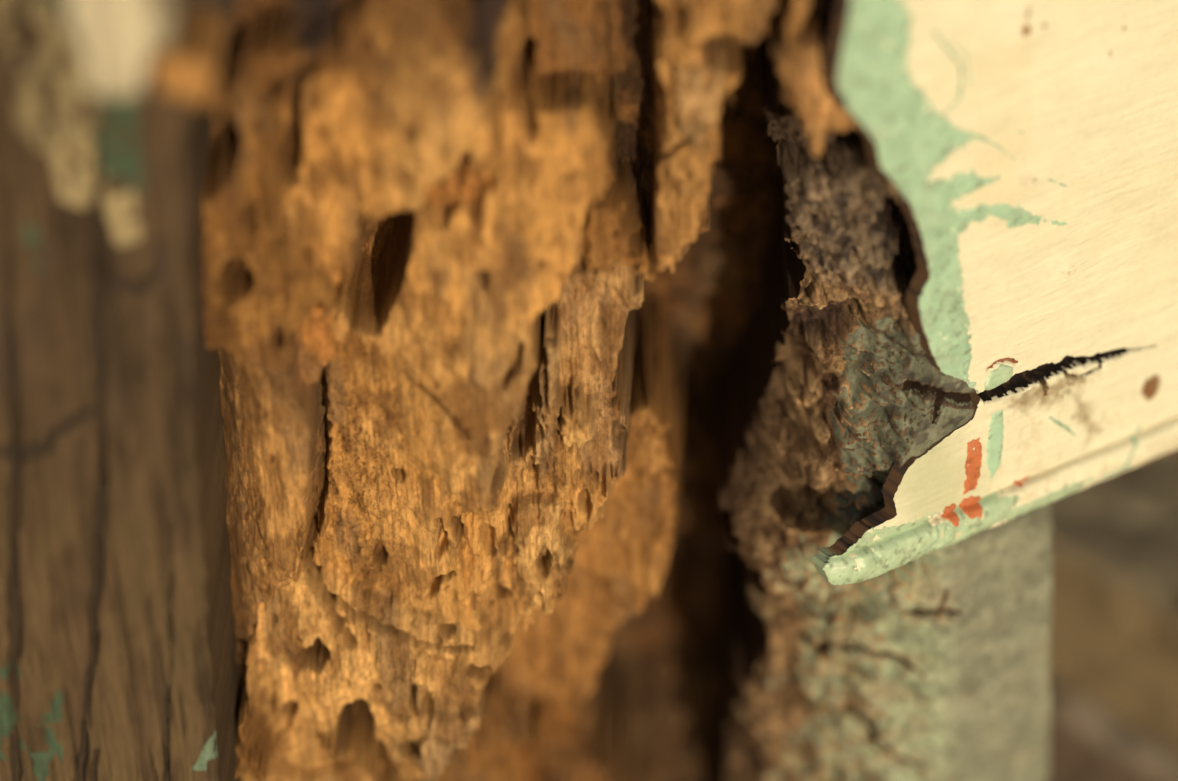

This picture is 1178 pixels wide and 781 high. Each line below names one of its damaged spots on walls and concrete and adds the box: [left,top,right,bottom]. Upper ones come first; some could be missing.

peeling [0,0,142,246]
crack [0,98,109,781]
peeling [218,0,1142,781]
crack [901,345,1154,424]
peeling [0,661,64,781]
peeling [191,731,218,771]